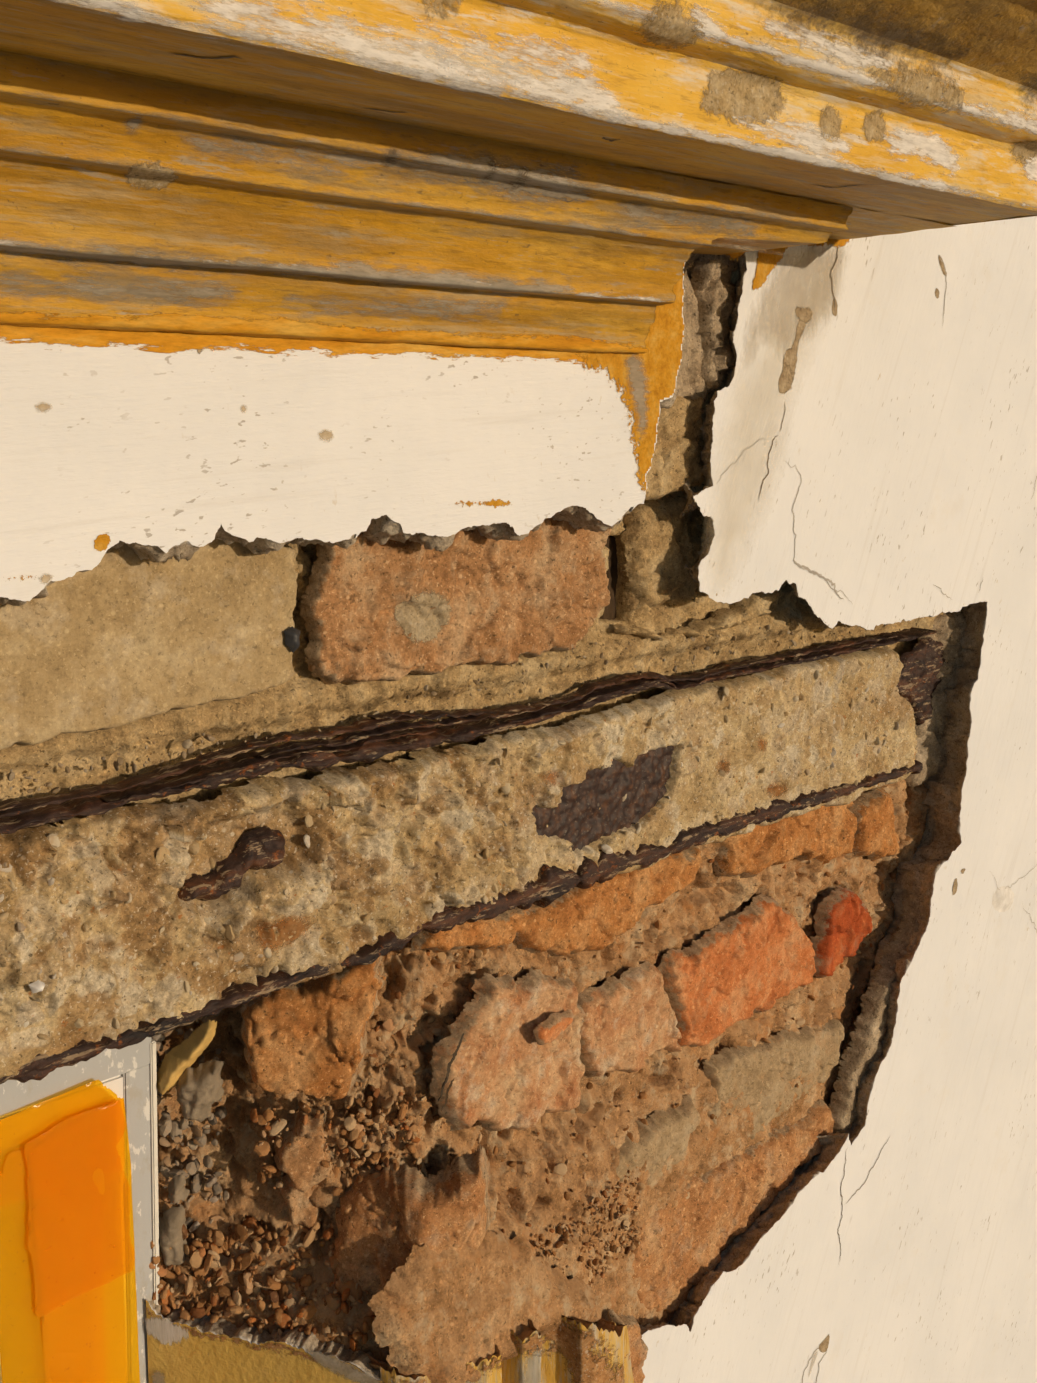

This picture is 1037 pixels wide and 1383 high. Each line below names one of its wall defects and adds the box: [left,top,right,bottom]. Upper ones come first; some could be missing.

peeling [198,0,625,124]
crack [830,248,838,316]
spalling [94,534,200,563]
spalling [215,253,866,641]
crack [715,409,852,603]
corrosion [0,633,901,818]
corrosion [896,637,948,726]
corrosion [531,746,674,851]
corrosion [177,826,285,902]
spalling [605,601,987,1383]
crack [838,1137,890,1262]
crack [802,1335,830,1383]